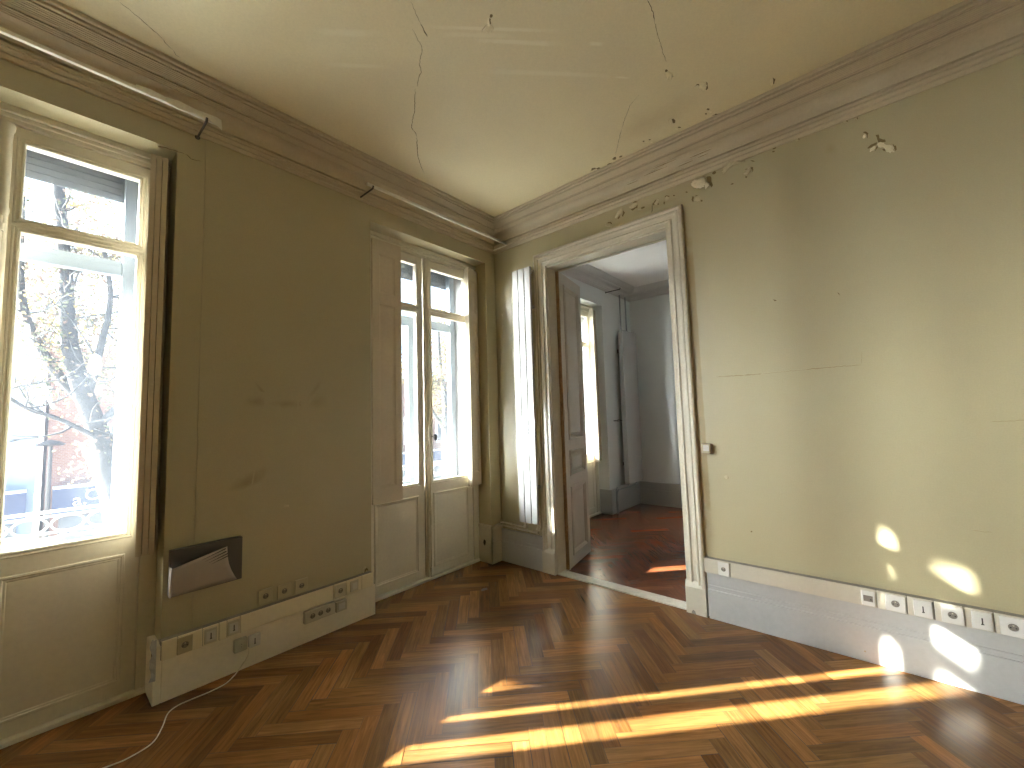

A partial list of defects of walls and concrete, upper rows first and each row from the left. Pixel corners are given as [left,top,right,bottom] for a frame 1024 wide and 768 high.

crack [410,2,428,173]
peeling [863,131,897,153]